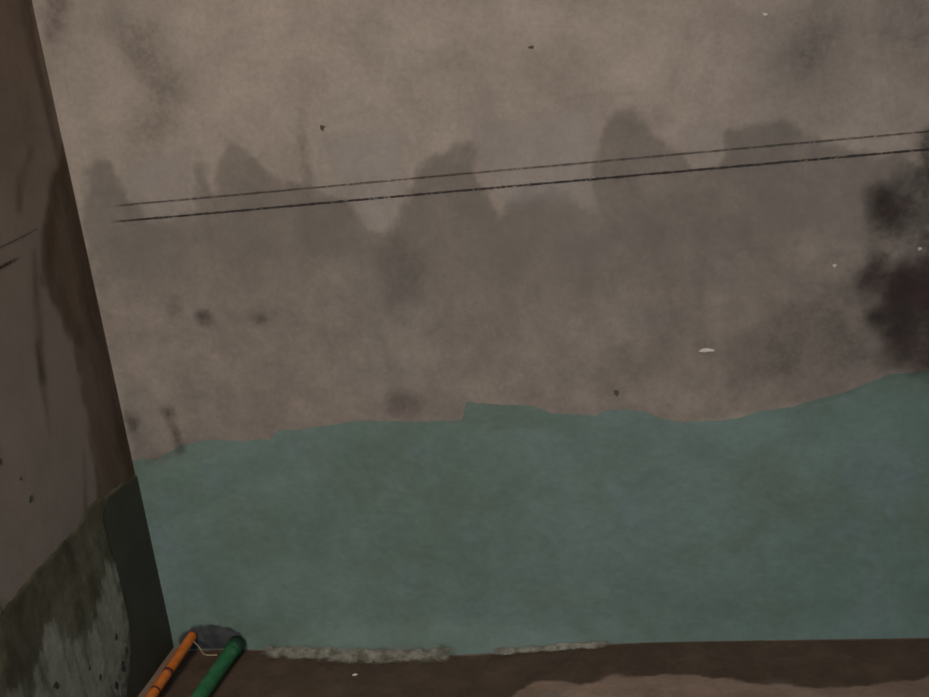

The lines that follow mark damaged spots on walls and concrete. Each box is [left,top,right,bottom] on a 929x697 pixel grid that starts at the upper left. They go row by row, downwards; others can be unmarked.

leakage [44,144,98,386]
leakage [862,261,929,370]
leakage [0,413,174,697]
leakage [158,650,223,697]
leakage [209,639,929,697]